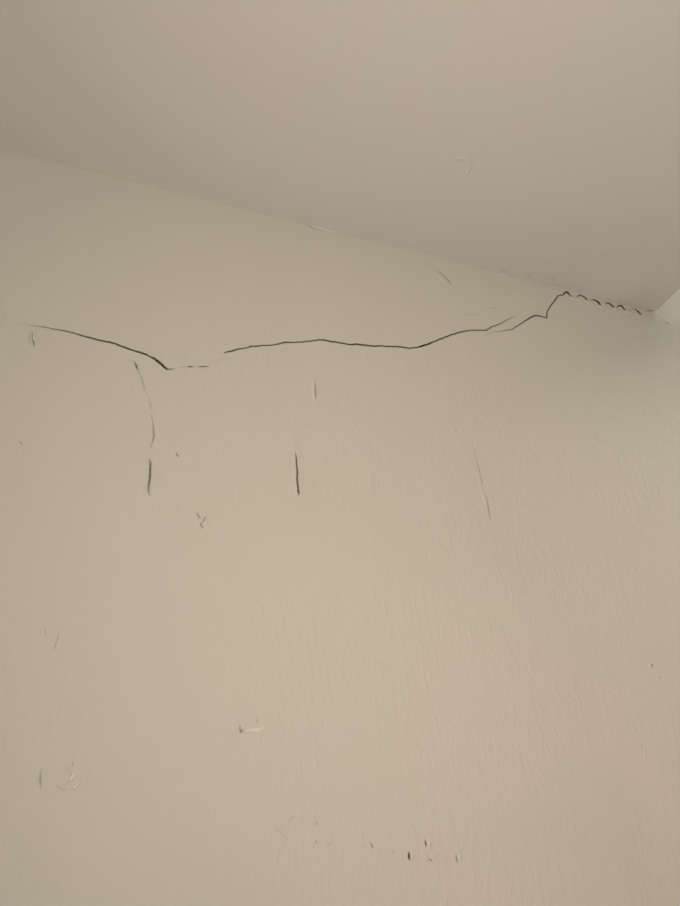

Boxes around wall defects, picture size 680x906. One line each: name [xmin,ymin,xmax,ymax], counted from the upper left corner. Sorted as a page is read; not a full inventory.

crack [58,291,646,373]
crack [146,413,154,495]